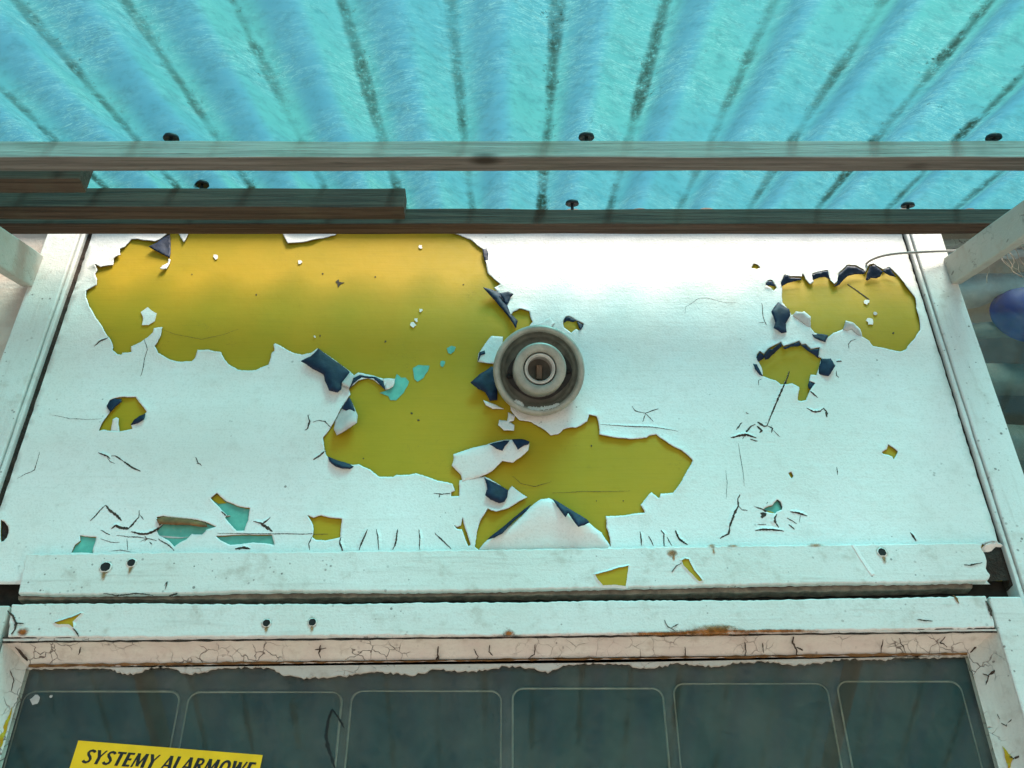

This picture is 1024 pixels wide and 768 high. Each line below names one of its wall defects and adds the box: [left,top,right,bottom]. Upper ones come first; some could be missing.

peeling [753,265,920,401]
peeling [87,234,692,550]
crack [718,373,828,539]
crack [88,504,174,552]
peeling [756,500,782,518]
peeling [593,564,631,589]
peeling [679,557,704,584]
rust [637,625,813,636]
crack [917,619,995,684]